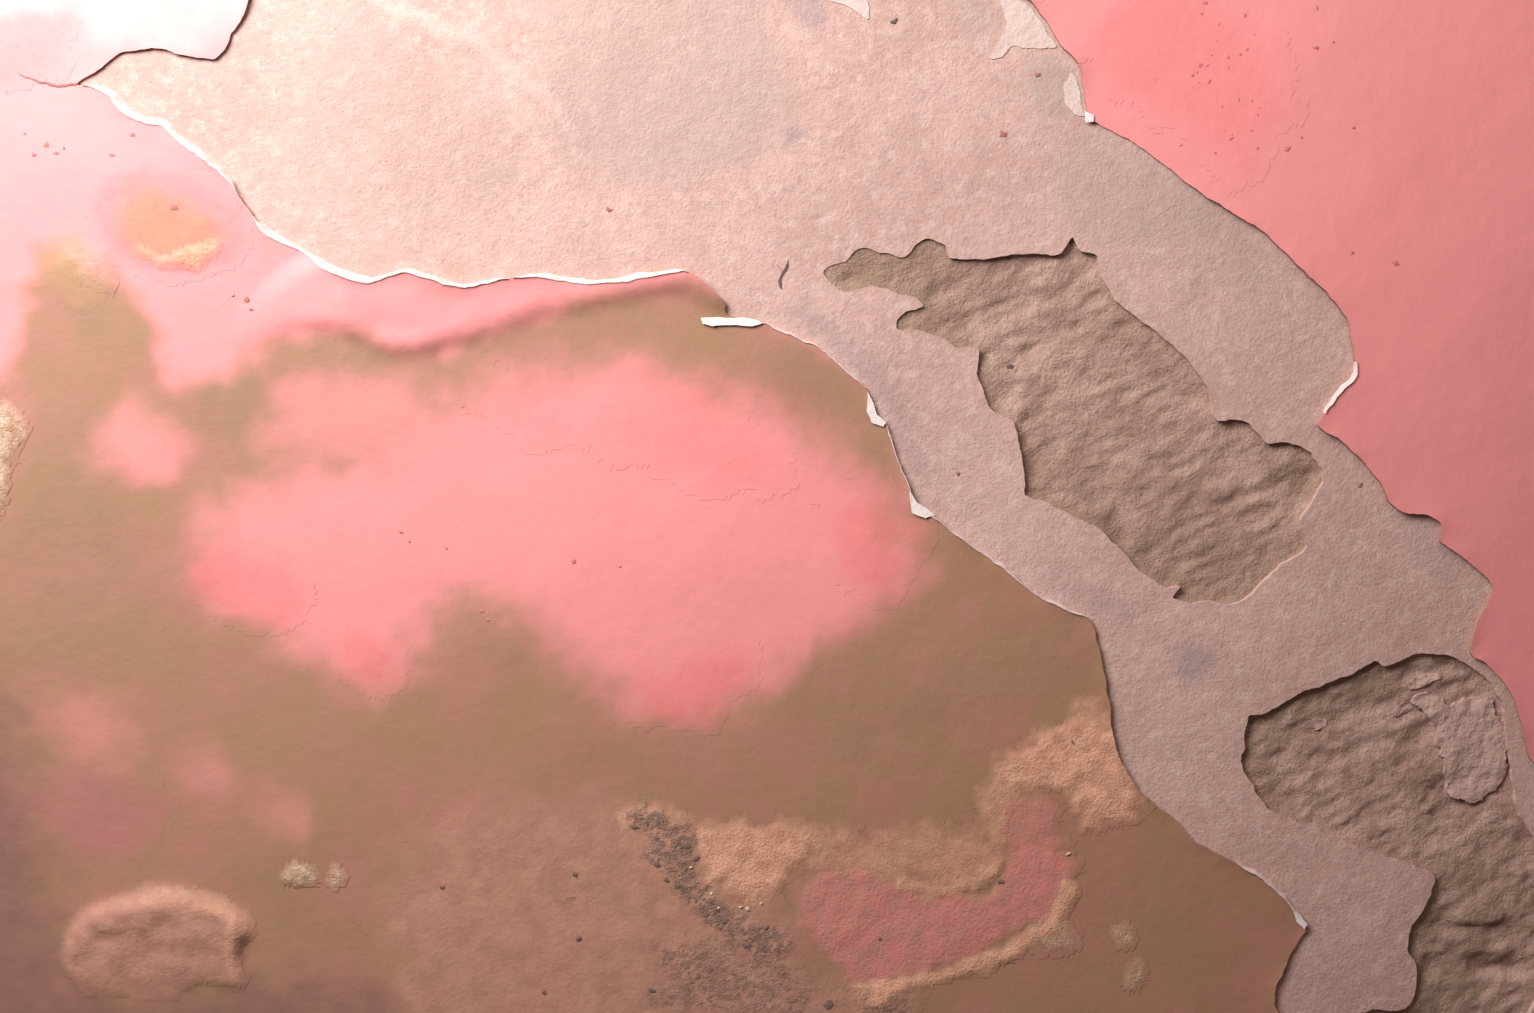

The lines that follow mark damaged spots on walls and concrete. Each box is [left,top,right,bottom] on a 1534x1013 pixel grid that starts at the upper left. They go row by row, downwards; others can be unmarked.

peeling [990,0,1056,59]
peeling [1063,72,1094,122]
peeling [82,85,240,196]
peeling [253,217,509,288]
peeling [513,269,688,285]
peeling [701,317,762,326]
peeling [765,323,867,389]
peeling [1323,361,1358,413]
spalling [823,238,1324,619]
water stain [0,156,1307,1013]
spalling [1236,653,1534,1013]
peeling [786,789,1086,982]